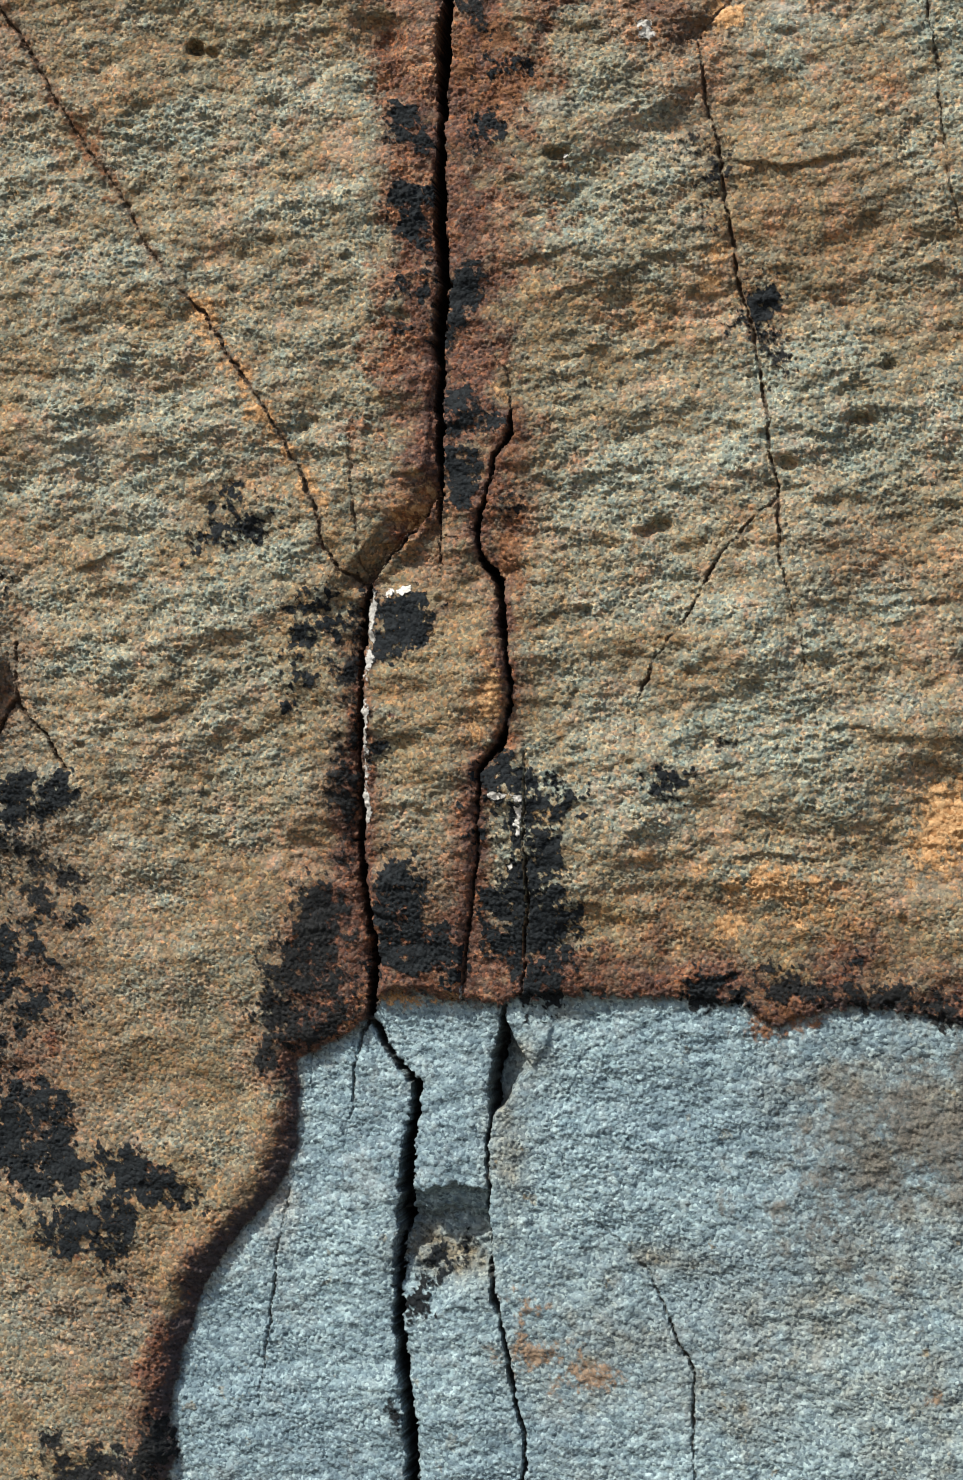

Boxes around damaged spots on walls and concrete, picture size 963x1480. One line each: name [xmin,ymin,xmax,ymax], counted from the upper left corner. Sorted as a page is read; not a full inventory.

crack [0,0,530,1480]
crack [630,0,819,754]
spalling [167,988,963,1480]
crack [552,1139,697,1480]